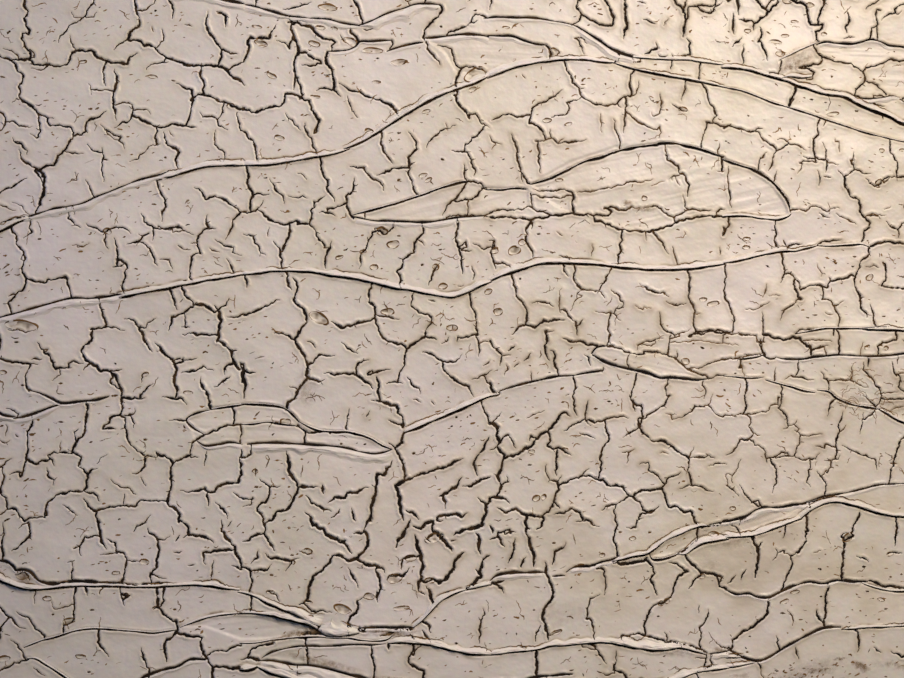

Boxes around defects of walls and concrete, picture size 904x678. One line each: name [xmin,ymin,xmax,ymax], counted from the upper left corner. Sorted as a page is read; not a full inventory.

crack [422,5,443,64]
crack [674,0,904,118]
crack [350,132,418,195]
crack [66,181,216,313]
crack [396,223,441,288]
crack [127,285,277,410]
crack [380,608,445,678]
crack [520,535,576,678]
crack [581,565,627,678]
crack [621,536,770,678]
crack [772,503,811,590]
crack [814,512,904,589]